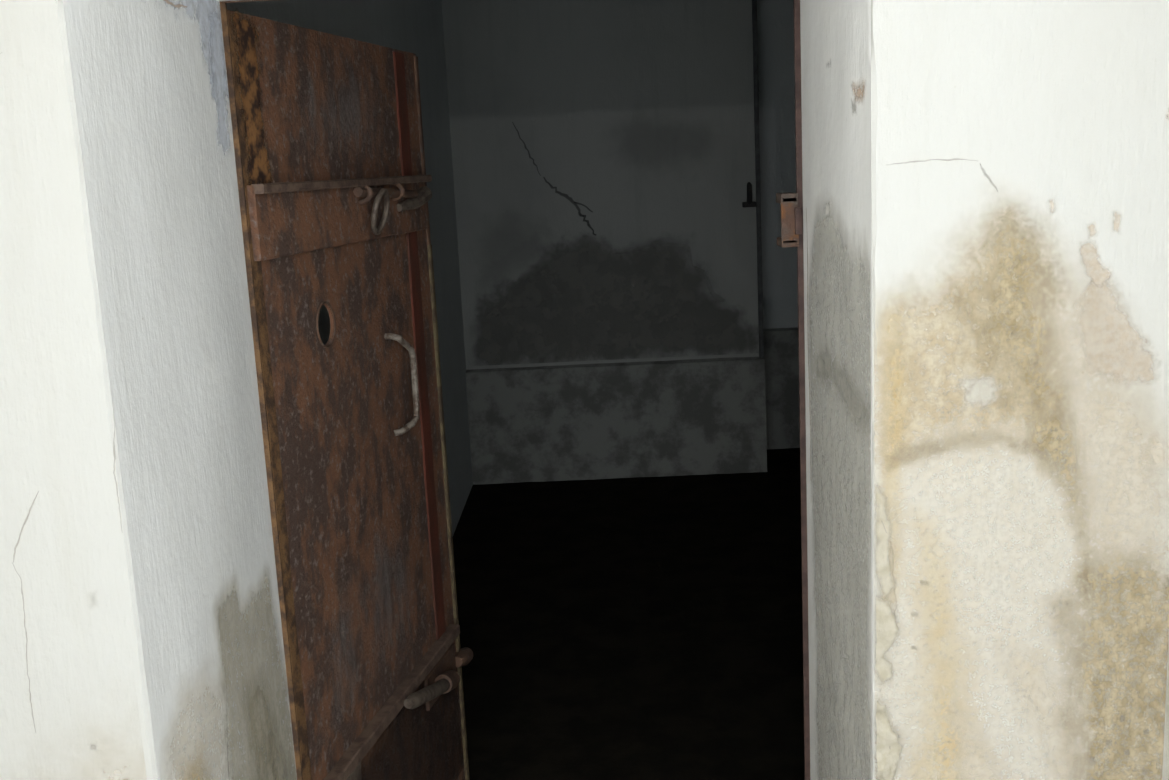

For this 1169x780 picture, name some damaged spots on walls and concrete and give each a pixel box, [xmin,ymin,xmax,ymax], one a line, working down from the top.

crack [512,122,596,235]
water stain [893,226,1077,503]
water stain [1080,225,1154,382]
water stain [218,580,296,780]
water stain [1081,562,1169,780]